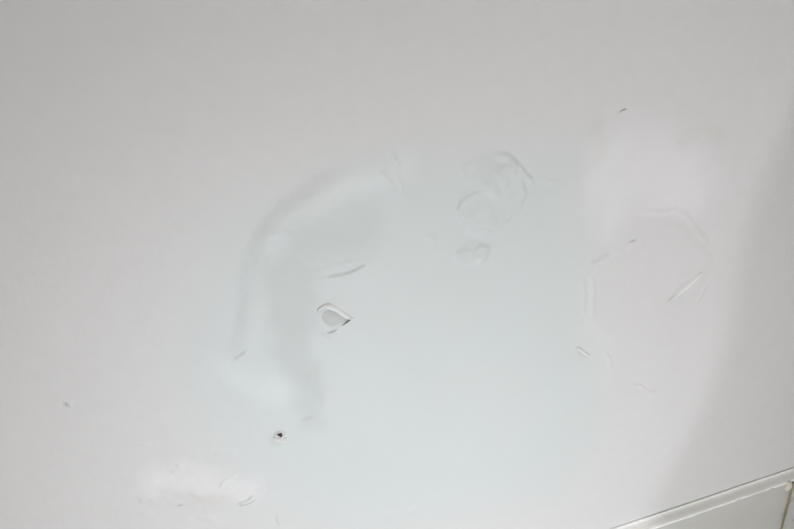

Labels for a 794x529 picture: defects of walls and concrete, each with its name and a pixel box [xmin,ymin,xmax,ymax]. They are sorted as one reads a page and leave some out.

peeling [317,304,354,334]